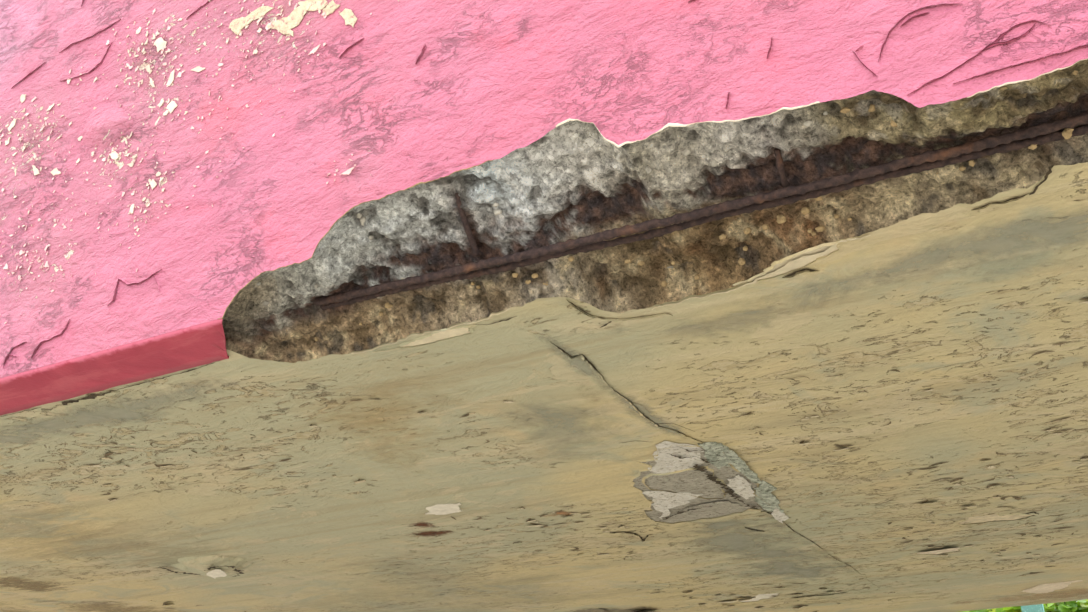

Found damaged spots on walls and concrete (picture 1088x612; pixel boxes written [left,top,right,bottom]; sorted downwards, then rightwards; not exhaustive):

spalling [219,58,1088,363]
crack [567,300,673,328]
crack [552,343,703,443]
peeling [425,503,591,555]
crack [613,532,653,541]
peeling [629,441,789,524]
crack [743,504,876,612]
peeling [898,446,1082,593]